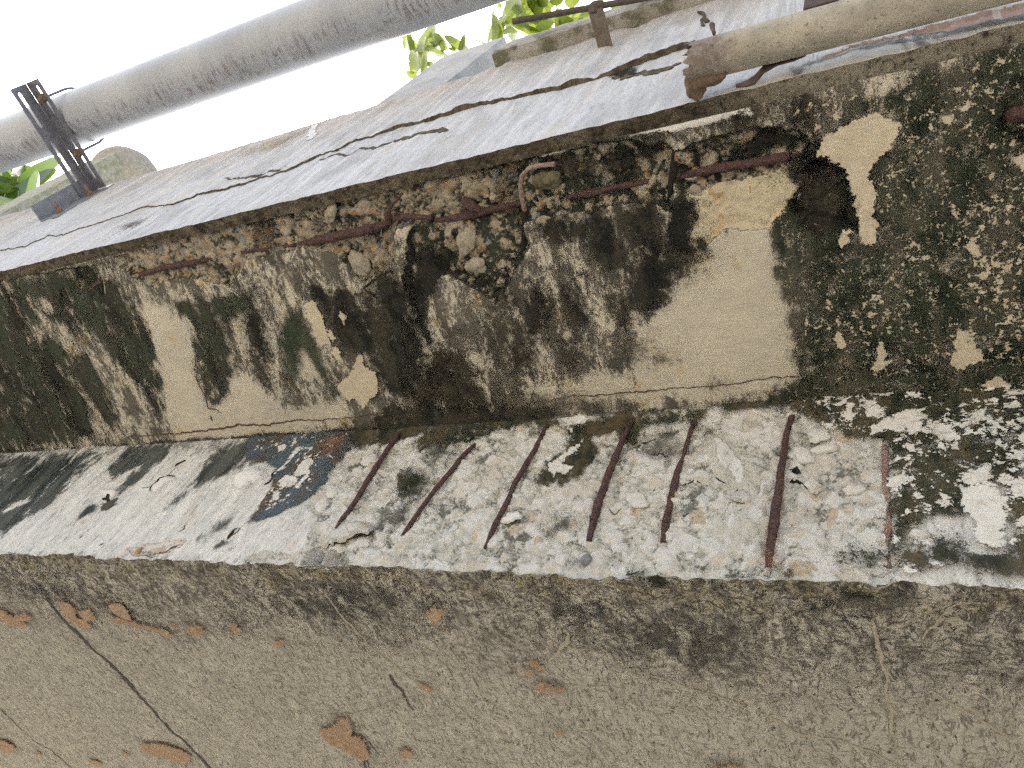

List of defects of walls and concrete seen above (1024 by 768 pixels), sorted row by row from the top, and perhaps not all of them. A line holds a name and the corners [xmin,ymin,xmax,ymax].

crack [0,40,696,251]
corrosion [241,162,555,260]
leakage [0,45,1024,538]
spalling [113,54,1024,587]
corrosion [327,431,401,529]
corrosion [400,442,476,536]
corrosion [483,424,550,549]
corrosion [586,418,636,542]
corrosion [660,418,697,543]
corrosion [759,414,795,570]
corrosion [881,444,892,569]
crack [45,596,210,768]